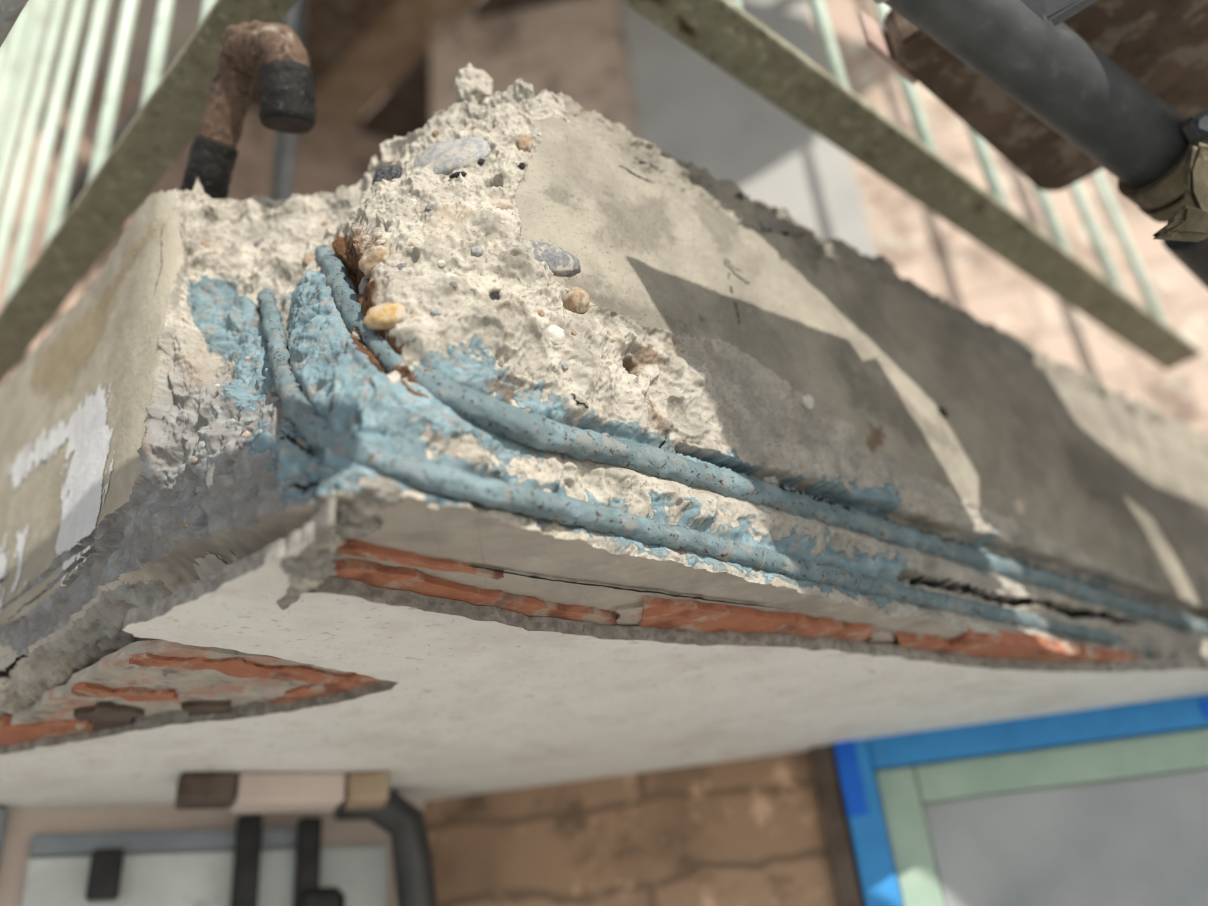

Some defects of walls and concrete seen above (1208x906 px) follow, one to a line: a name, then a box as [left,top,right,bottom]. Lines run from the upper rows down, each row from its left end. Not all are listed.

rust [332,236,375,317]
rust [345,329,386,374]
rust [374,329,405,355]
spalling [0,63,1208,671]
peeling [0,359,1208,809]
crack [769,482,1183,625]
crack [0,655,27,676]